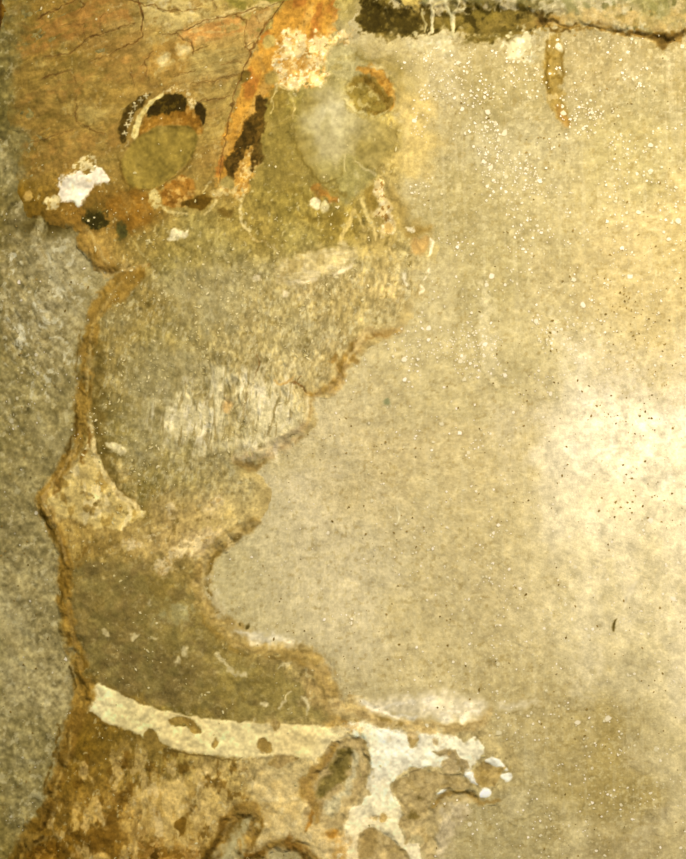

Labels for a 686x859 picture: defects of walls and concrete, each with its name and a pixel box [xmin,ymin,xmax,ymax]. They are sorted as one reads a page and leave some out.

crack [30,0,286,185]
damp [345,0,467,187]
corrosion [539,30,573,130]
crack [532,1,686,52]
spalling [289,323,409,438]
spalling [7,222,152,859]
spalling [142,727,169,752]
spalling [167,715,202,735]
spalling [188,514,508,859]
spalling [172,815,188,839]